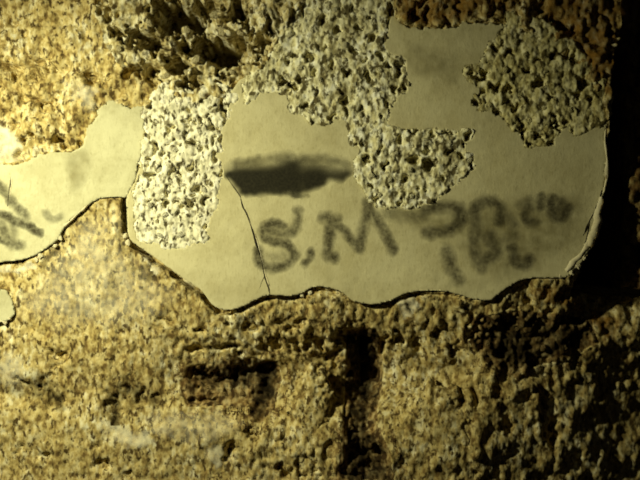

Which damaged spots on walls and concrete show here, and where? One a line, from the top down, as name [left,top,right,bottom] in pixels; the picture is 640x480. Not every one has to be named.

flaking render [0,0,614,310]
crack [227,178,270,295]
flaking render [0,289,16,325]
spalling [171,348,292,437]
spalling [328,323,408,480]
spalling [459,306,608,382]